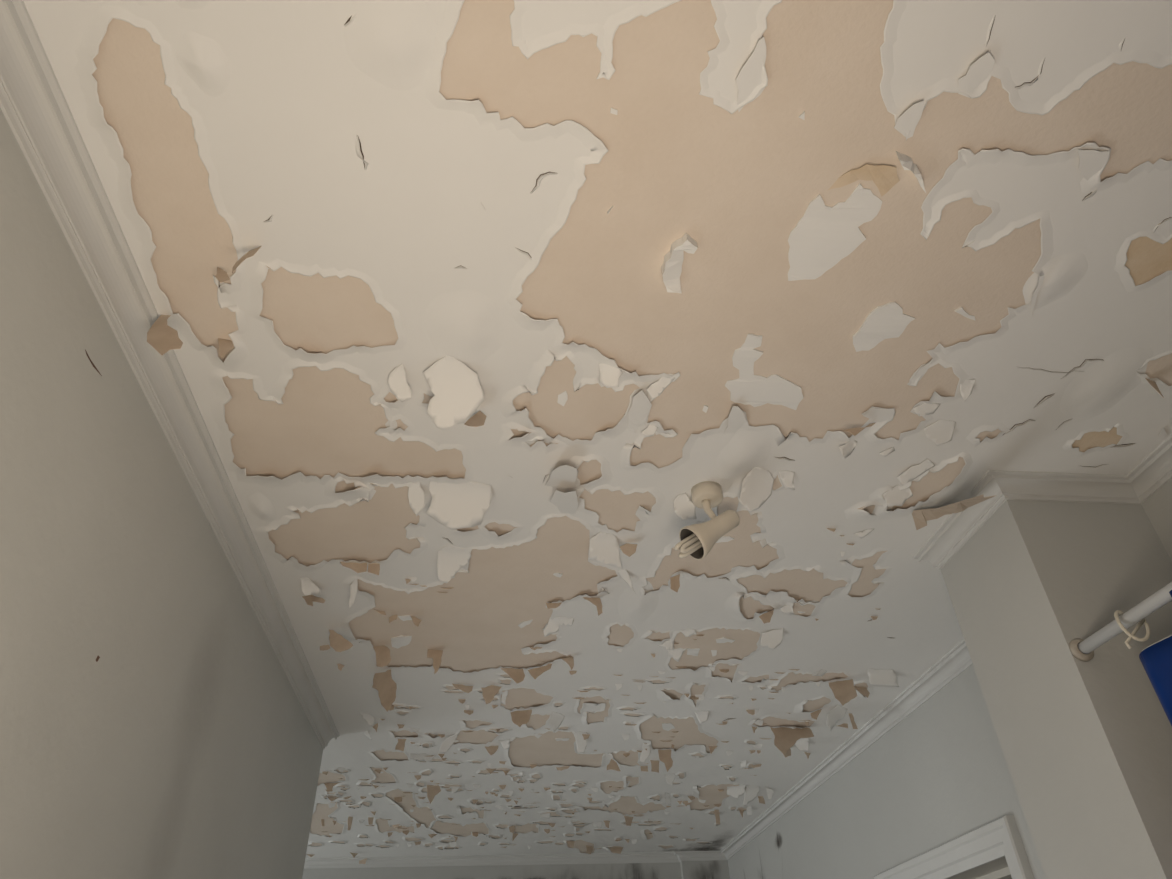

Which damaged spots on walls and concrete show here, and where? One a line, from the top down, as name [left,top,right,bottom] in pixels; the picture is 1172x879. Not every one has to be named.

peeling [425,0,1172,473]
peeling [844,423,1012,530]